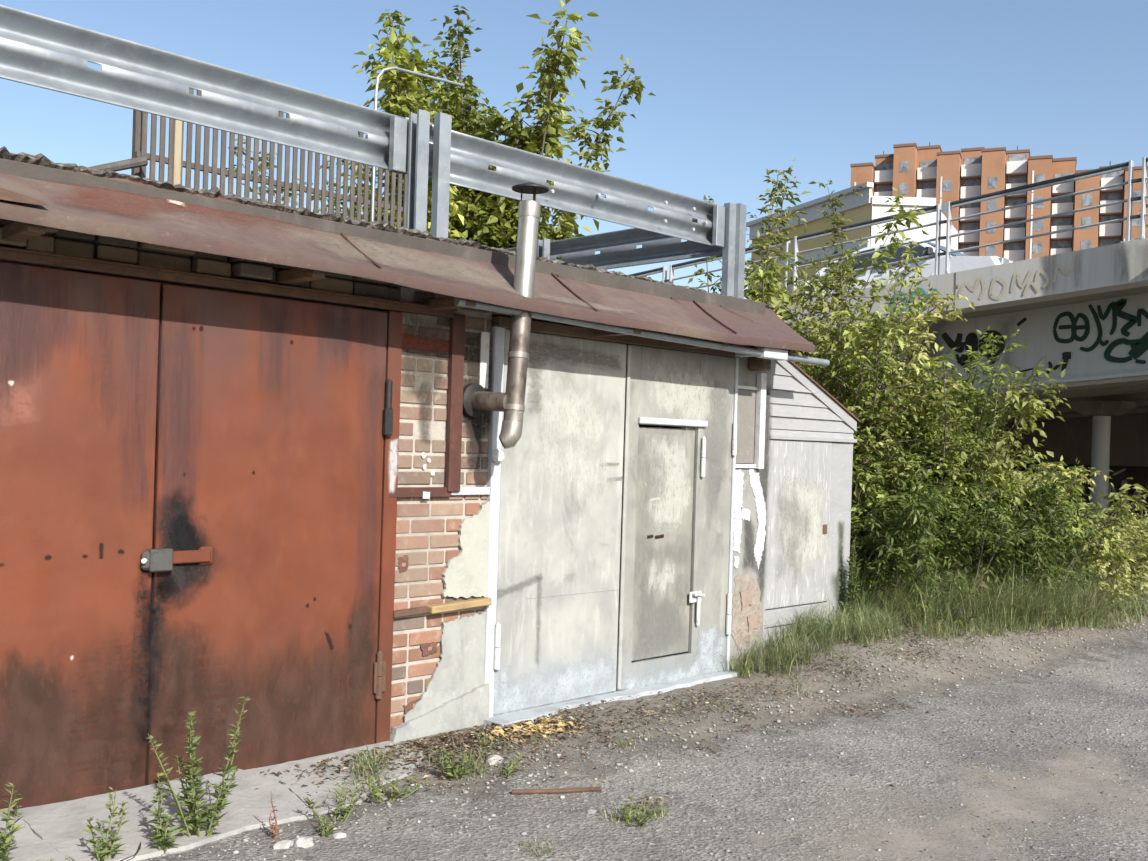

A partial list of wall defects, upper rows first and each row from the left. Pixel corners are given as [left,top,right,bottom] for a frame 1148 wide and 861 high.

spalling [398,555,409,573]
spalling [731,468,766,651]
damp [137,570,197,740]
peeling [316,616,1148,844]
peeling [209,824,306,861]